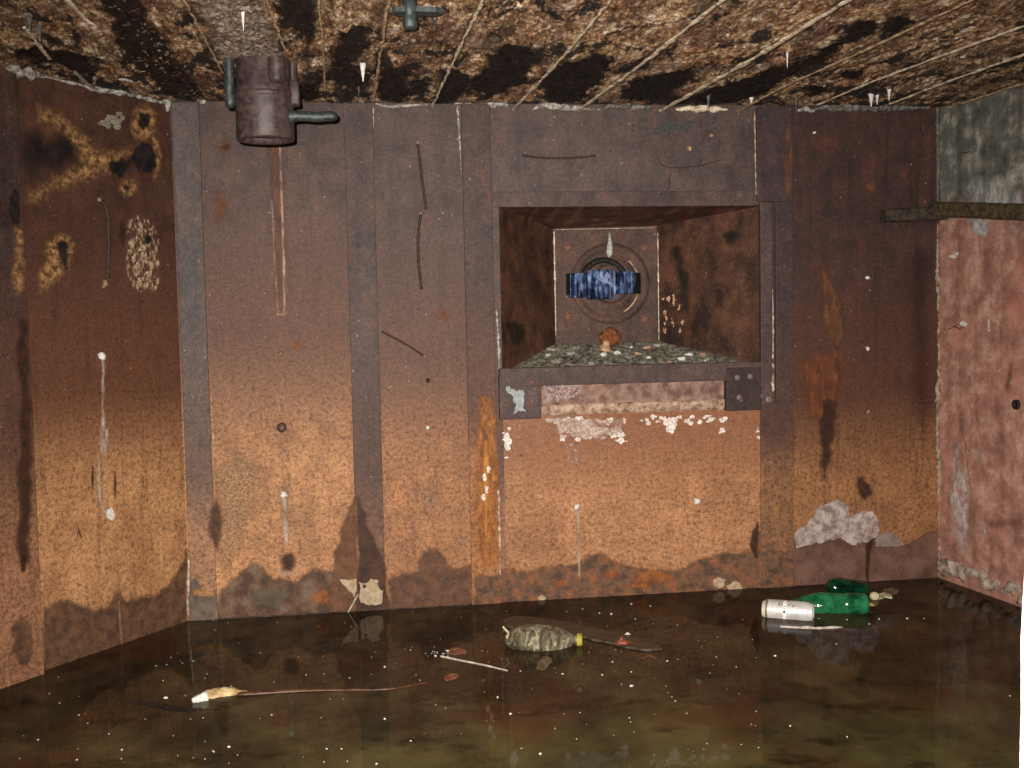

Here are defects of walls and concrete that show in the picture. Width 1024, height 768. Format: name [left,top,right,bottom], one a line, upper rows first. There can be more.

damp [0,0,206,112]
damp [204,0,317,59]
damp [299,86,322,101]
damp [326,14,930,113]
damp [109,143,157,195]
damp [17,321,31,571]
corrosion [476,397,500,565]
peeling [546,416,626,469]
peeling [640,414,728,435]
corrosion [802,352,840,477]
peeling [794,500,904,548]
damp [12,499,939,671]